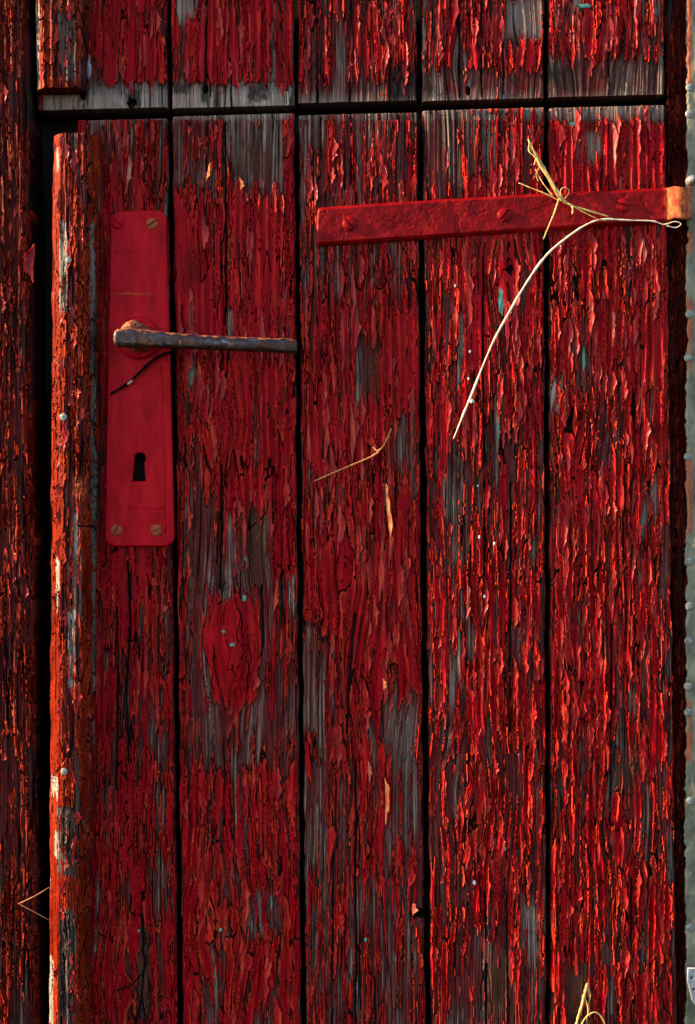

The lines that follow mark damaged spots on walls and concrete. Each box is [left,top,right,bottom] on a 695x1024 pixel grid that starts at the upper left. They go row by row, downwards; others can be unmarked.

peeling [38,0,666,338]
peeling [2,277,24,313]
peeling [55,224,85,634]
peeling [3,540,29,599]
peeling [93,232,677,1024]
peeling [55,645,83,724]
peeling [55,740,81,790]
peeling [53,811,82,951]
peeling [53,955,80,1024]